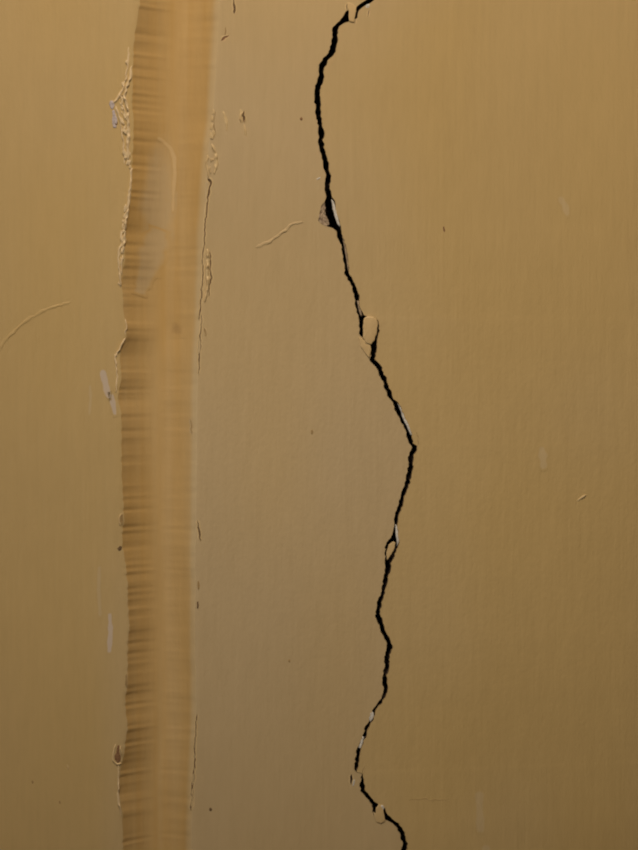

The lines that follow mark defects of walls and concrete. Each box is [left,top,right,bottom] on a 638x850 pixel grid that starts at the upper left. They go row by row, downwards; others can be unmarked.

peeling [109,47,133,287]
crack [314,0,420,850]